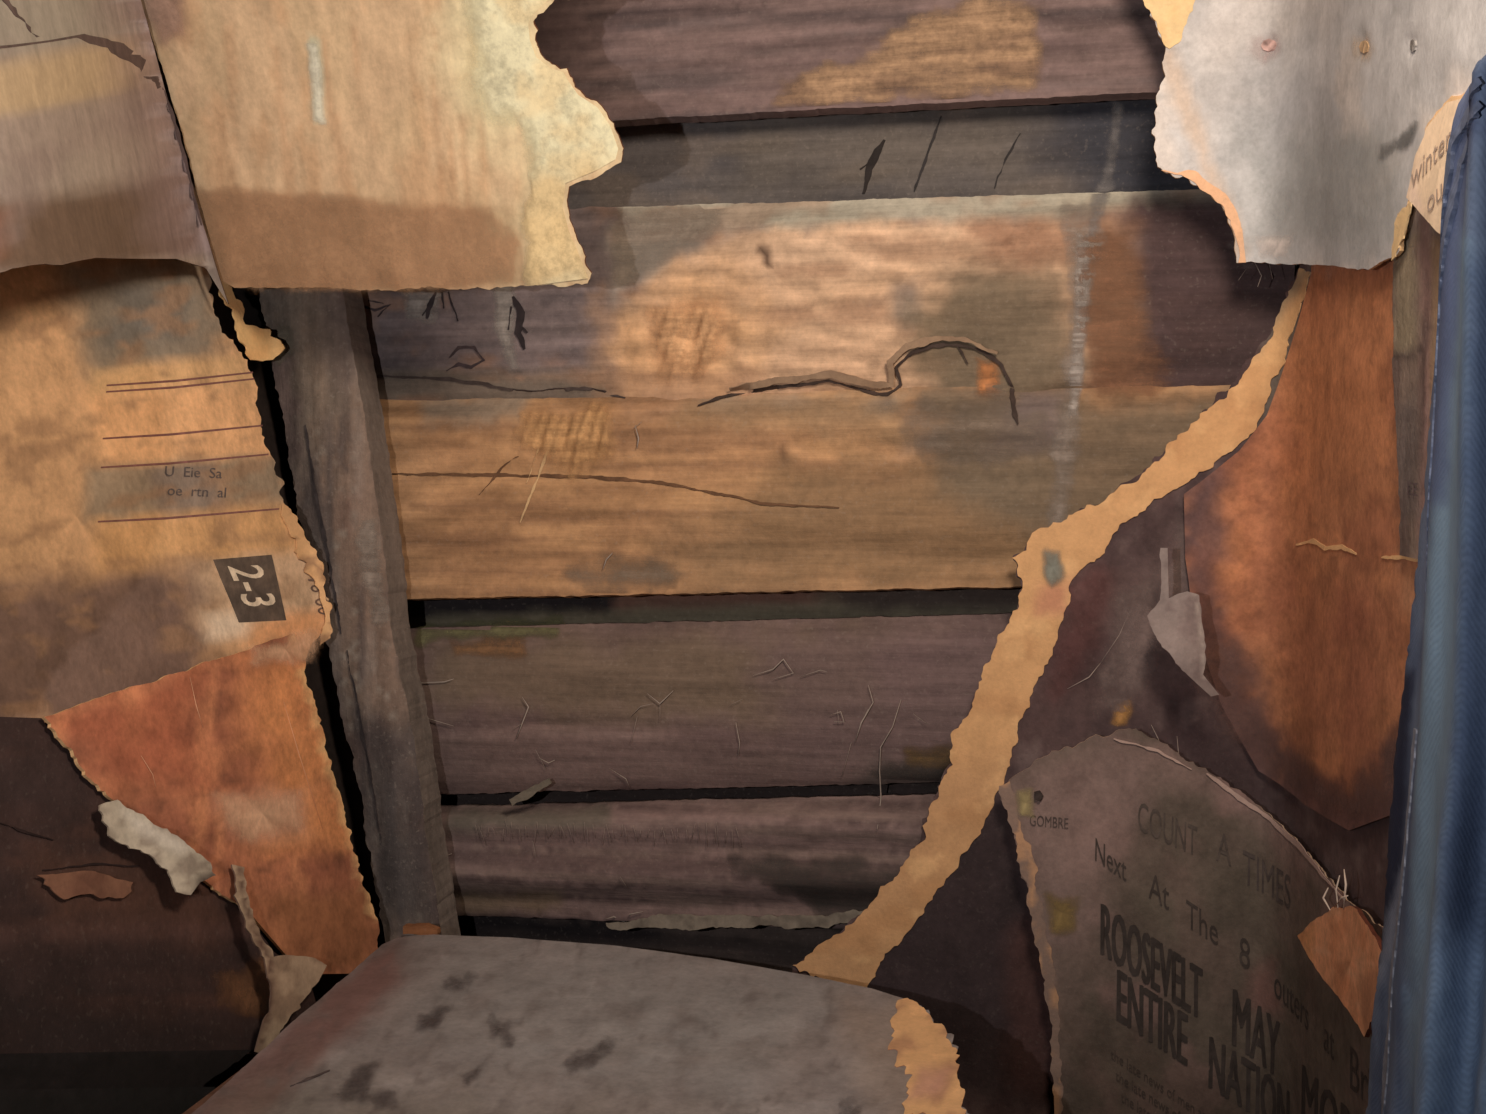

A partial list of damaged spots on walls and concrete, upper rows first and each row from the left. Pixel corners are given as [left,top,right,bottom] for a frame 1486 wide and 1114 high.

peeling [467,0,618,286]
crack [860,139,886,194]
crack [914,116,942,192]
crack [994,133,1021,188]
crack [698,343,1019,424]
crack [392,456,839,508]